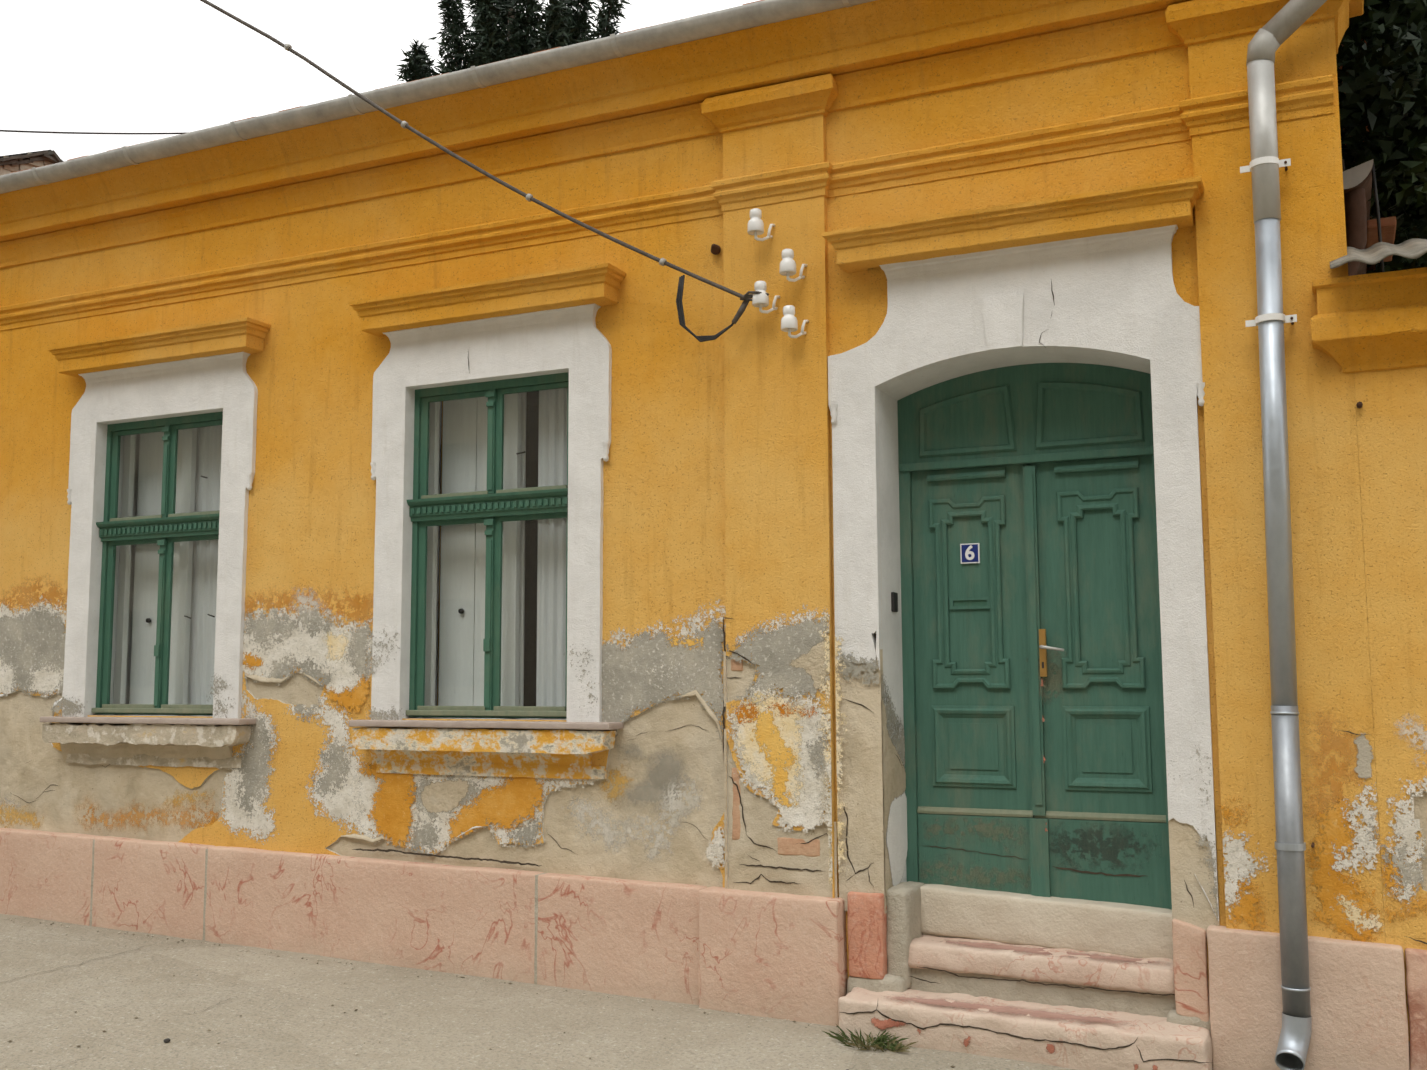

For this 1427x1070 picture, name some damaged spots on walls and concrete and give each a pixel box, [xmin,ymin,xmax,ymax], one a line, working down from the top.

flaking render [0,596,908,914]
flaking render [1354,733,1373,779]
flaking render [1410,791,1427,891]
crack [909,966,1175,996]
crack [839,1004,1212,1063]